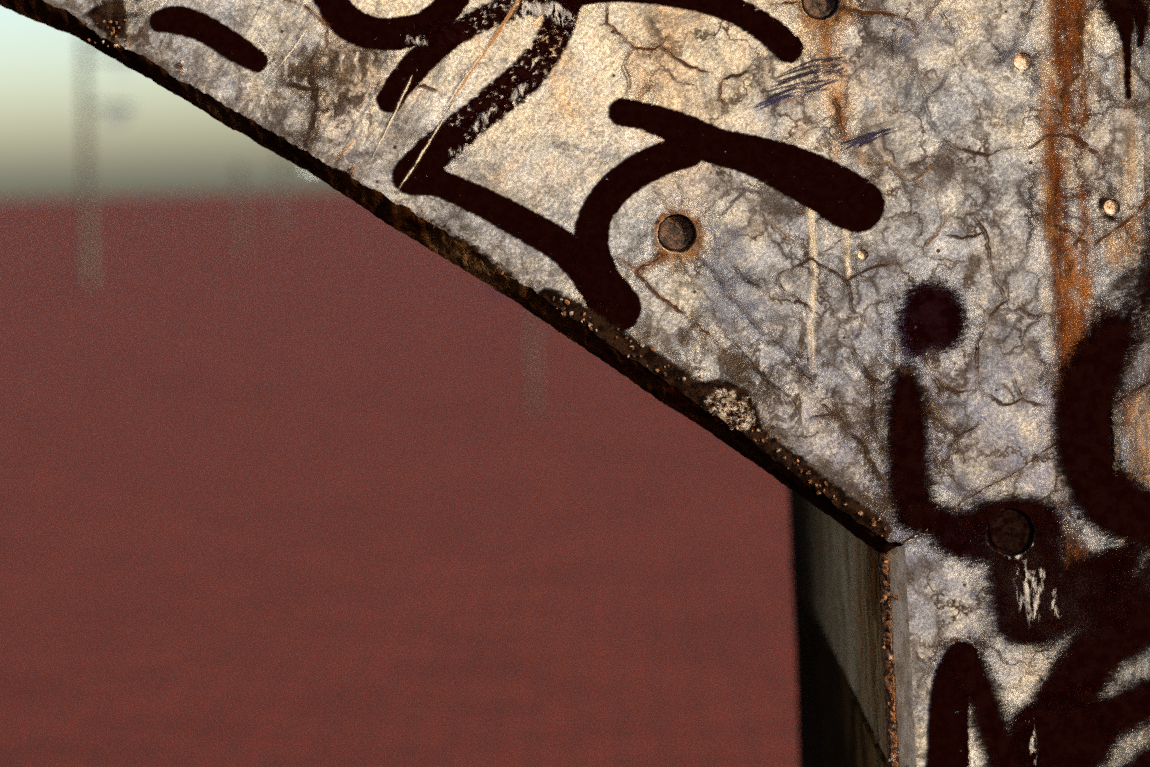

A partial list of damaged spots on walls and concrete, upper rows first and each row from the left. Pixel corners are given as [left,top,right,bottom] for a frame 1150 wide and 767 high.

crack [286,0,329,149]
corrosion [795,0,851,57]
corrosion [636,209,704,275]
crack [603,0,1103,484]
corrosion [1045,0,1090,409]
crack [1056,197,1150,277]